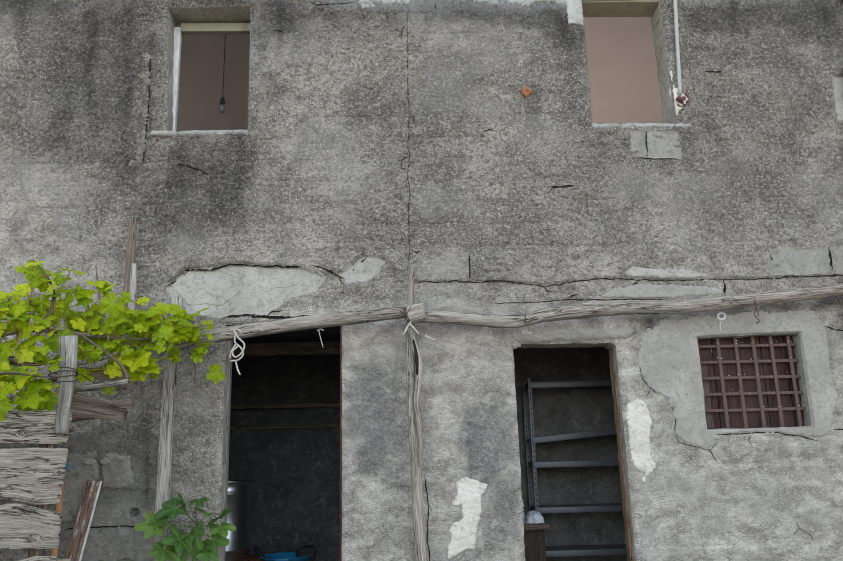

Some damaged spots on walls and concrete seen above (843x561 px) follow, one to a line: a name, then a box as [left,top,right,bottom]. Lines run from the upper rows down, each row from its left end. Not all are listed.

flaking render [359,0,415,9]
flaking render [463,0,584,26]
crack [401,8,420,260]
crack [639,132,678,164]
flaking render [166,265,326,318]
flaking render [339,253,385,283]
crack [418,248,842,304]
crack [672,408,843,463]
crack [423,474,431,561]